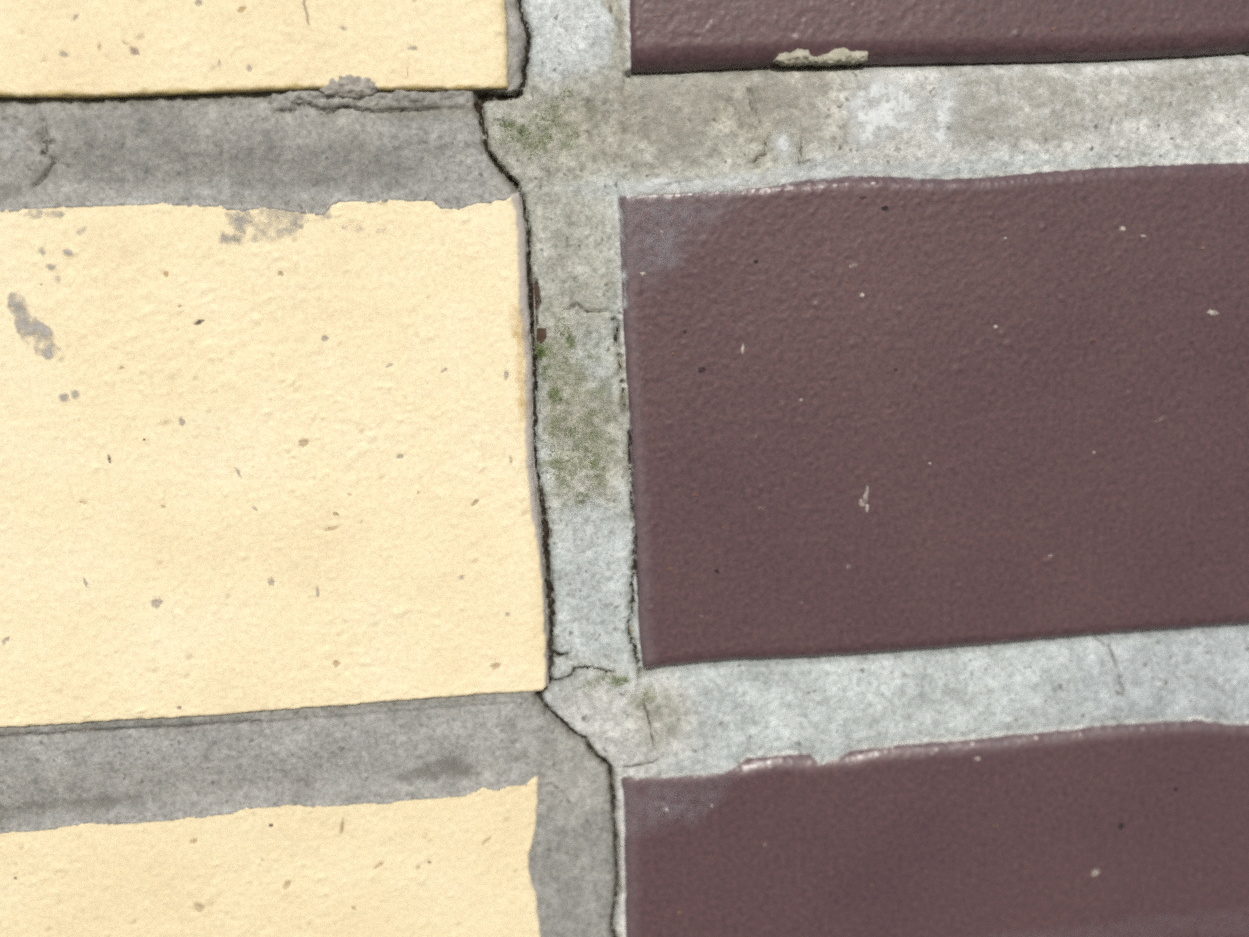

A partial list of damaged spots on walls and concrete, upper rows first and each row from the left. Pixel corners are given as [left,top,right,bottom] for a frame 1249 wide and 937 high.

crack [475,0,658,937]
leakage [619,130,943,193]